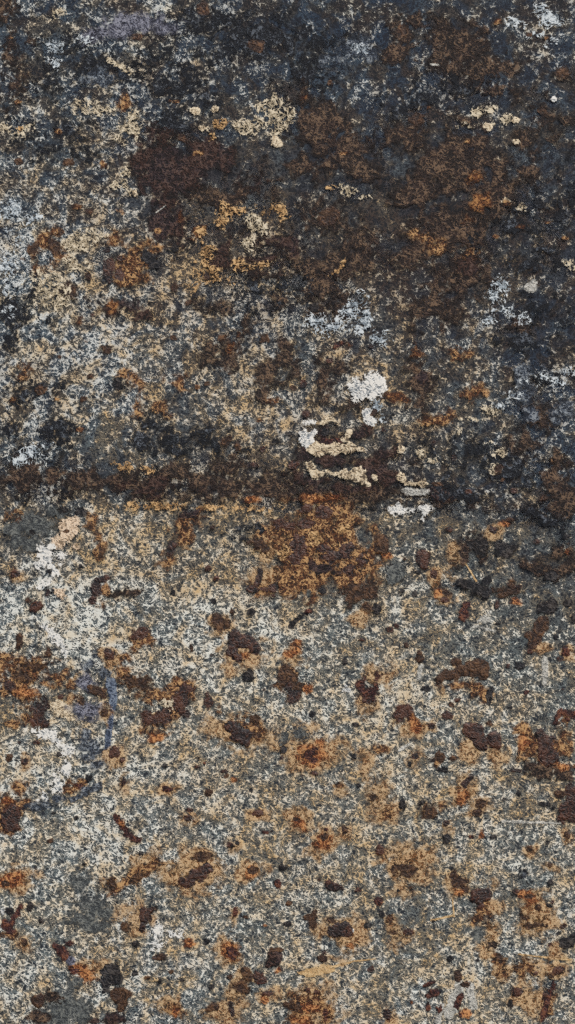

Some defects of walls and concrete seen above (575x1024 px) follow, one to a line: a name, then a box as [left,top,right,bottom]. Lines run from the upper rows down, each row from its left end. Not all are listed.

rust [0,10,575,682]
rust [0,626,575,1024]